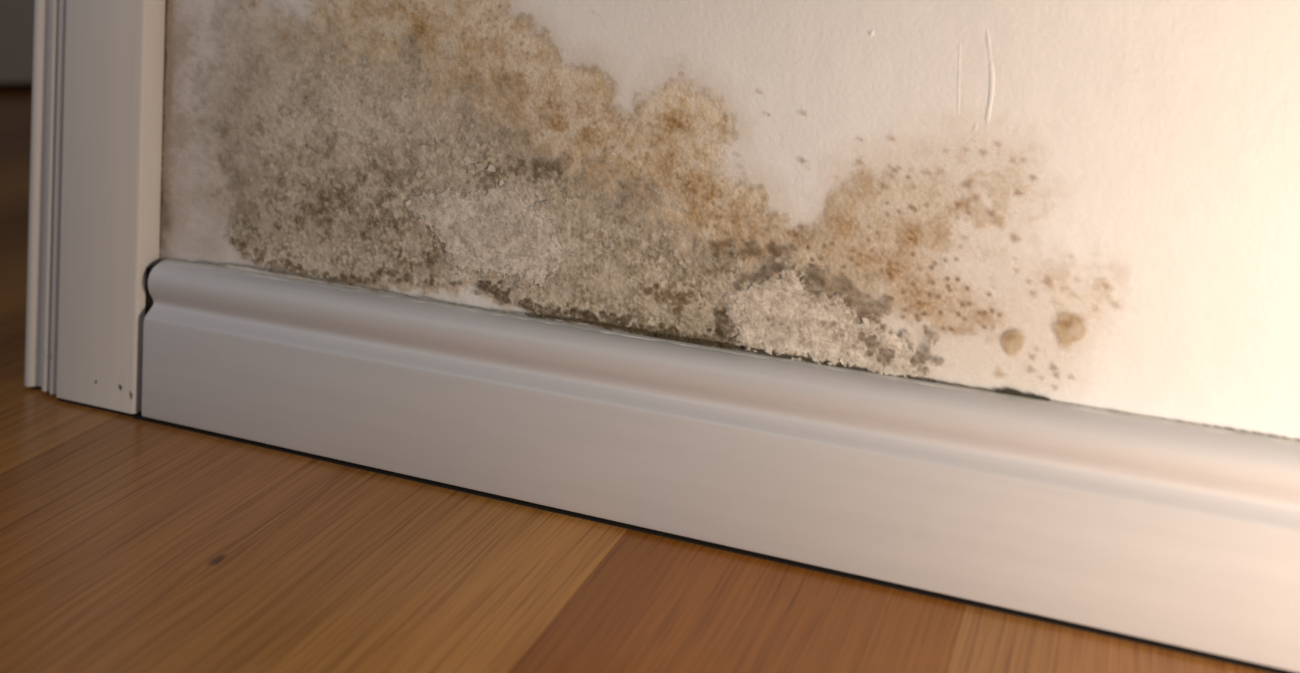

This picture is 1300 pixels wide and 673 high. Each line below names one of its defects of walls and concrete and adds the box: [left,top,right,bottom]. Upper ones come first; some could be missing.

damp [160,0,1026,374]
damp [1051,278,1085,346]